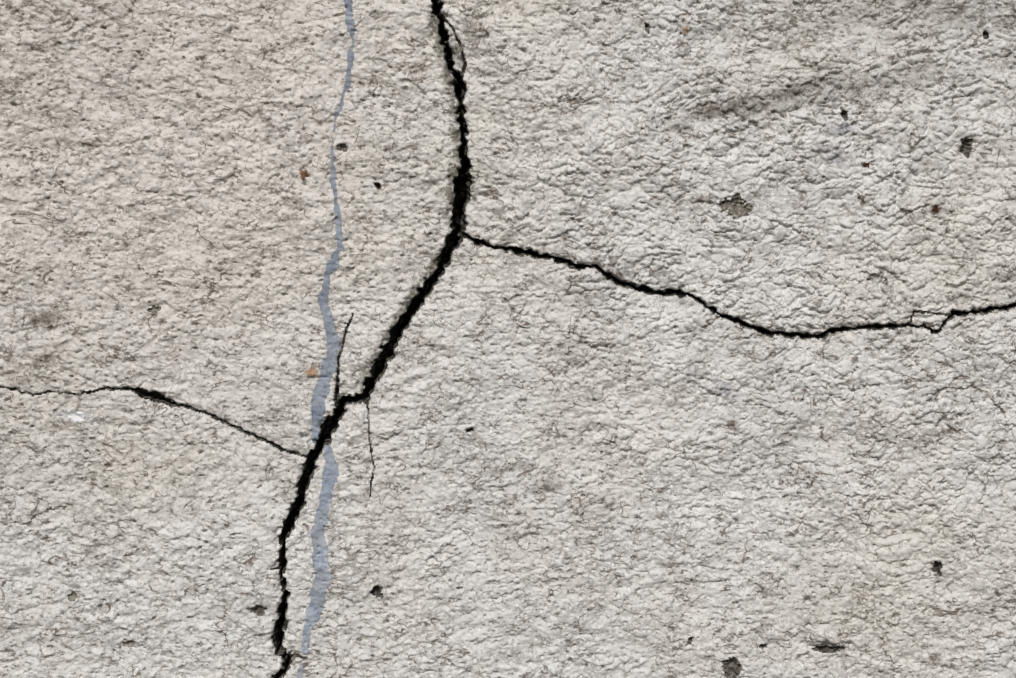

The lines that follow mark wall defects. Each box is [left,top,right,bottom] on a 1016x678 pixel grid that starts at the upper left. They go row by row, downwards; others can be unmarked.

crack [0,0,472,678]
crack [463,232,1016,340]
crack [922,385,1007,419]